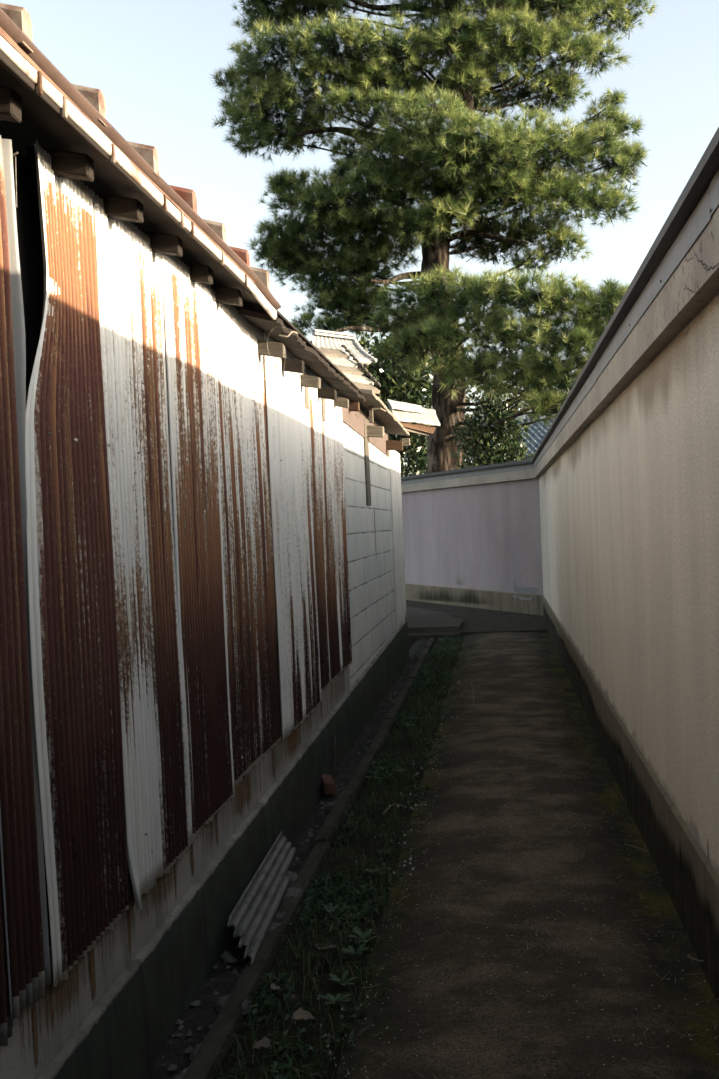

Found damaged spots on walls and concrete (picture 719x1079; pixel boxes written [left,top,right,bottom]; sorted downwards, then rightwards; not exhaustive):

rust [0,170,353,1066]
crack [684,248,719,294]